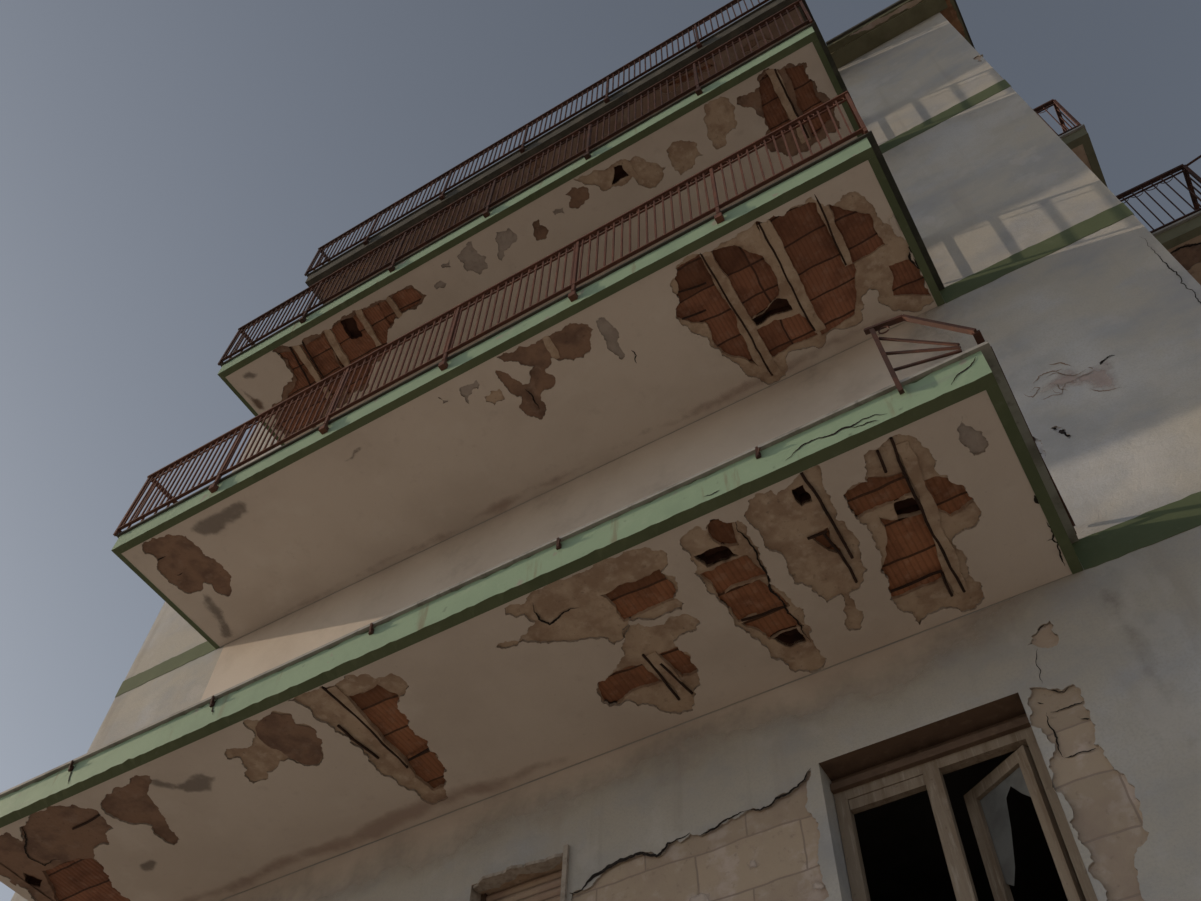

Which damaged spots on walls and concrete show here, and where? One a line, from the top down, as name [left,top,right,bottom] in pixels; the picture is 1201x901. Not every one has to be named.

spalling [553,62,840,215]
spalling [272,228,517,437]
spalling [459,317,625,419]
spalling [670,191,933,384]
crack [1141,237,1201,303]
spalling [142,534,232,596]
spalling [497,547,700,713]
spalling [680,434,984,671]
spalling [0,775,179,901]
spalling [225,673,447,803]
spalling [572,772,829,901]
spalling [1028,686,1149,901]